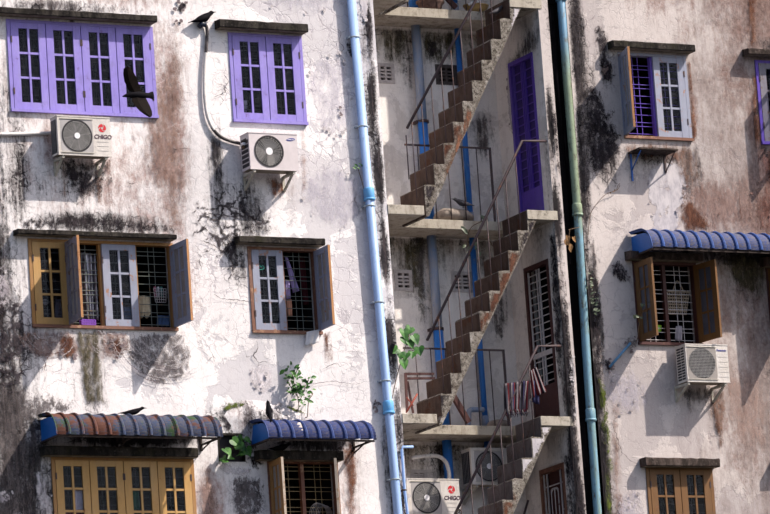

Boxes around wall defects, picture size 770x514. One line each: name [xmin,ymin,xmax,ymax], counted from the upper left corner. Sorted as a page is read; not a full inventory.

leakage [383,31,412,86]
leakage [422,31,453,63]
leakage [571,0,653,223]
leakage [24,56,185,234]
leakage [663,145,704,196]
crack [198,213,251,270]
leakage [194,135,270,279]
rust [681,202,708,229]
leakage [0,282,199,514]
leakage [684,387,718,410]